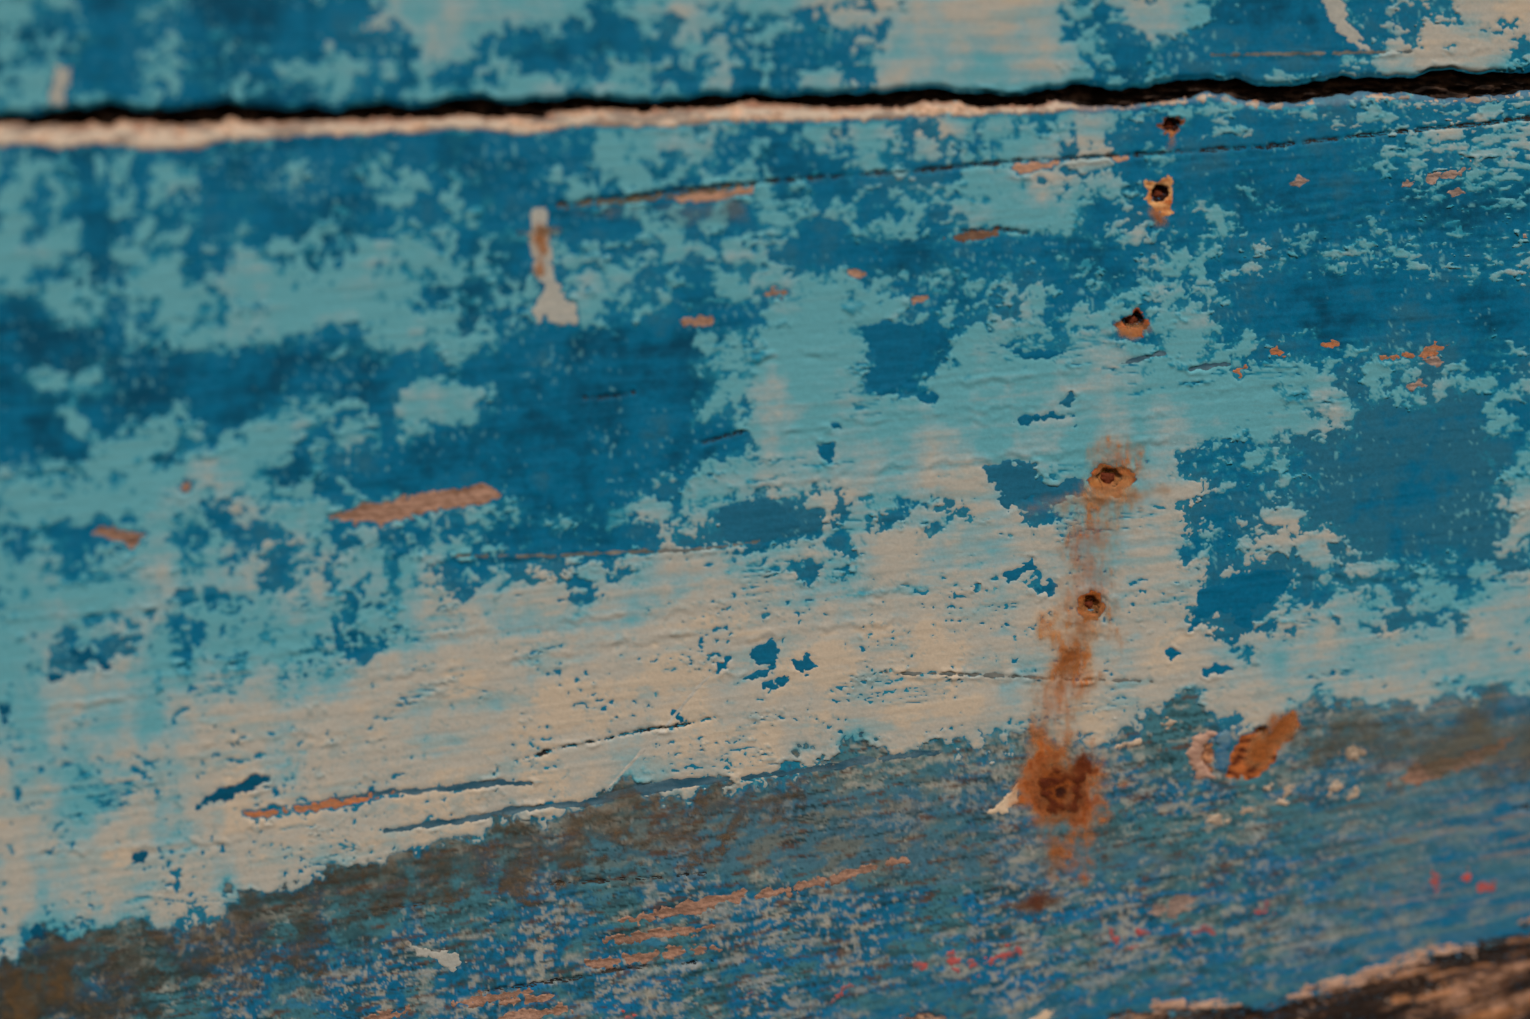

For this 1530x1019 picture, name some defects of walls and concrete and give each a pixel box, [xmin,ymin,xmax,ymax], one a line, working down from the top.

peeling [353,0,1217,105]
crack [1210,49,1412,57]
peeling [1259,0,1530,84]
crack [545,115,1530,209]
peeling [1330,91,1530,224]
crack [961,227,1028,235]
peeling [1316,208,1530,286]
peeling [394,375,498,445]
rust [1068,438,1141,541]
rust [1039,609,1095,701]
rust [1249,712,1296,765]
rust [1017,732,1106,858]